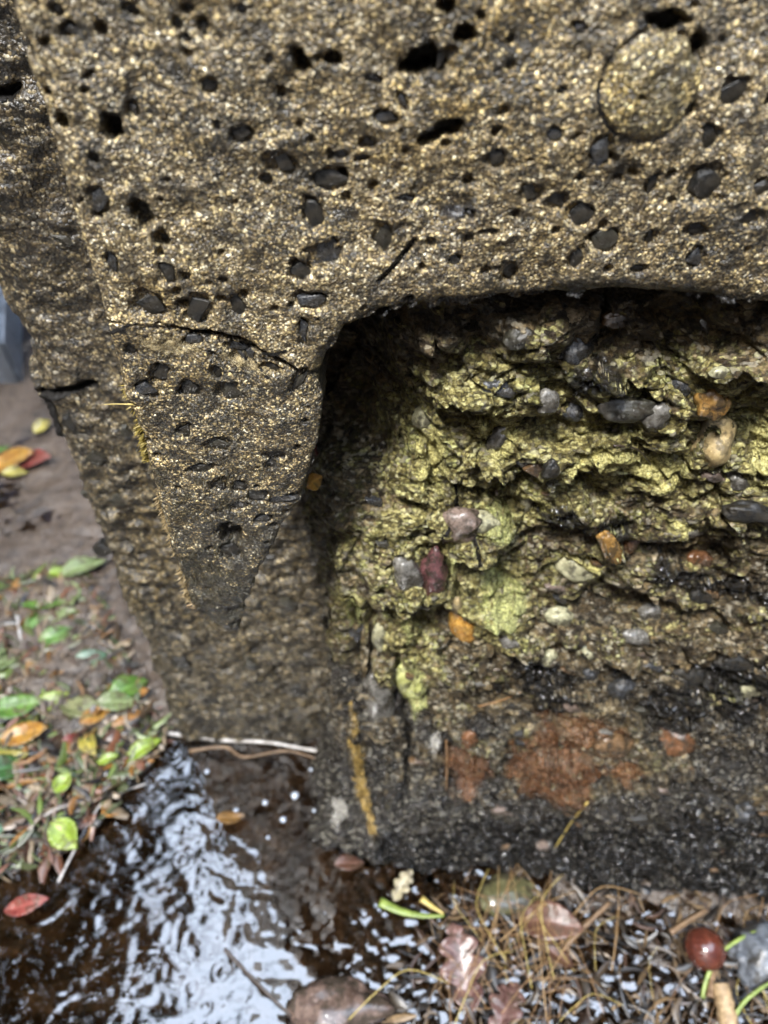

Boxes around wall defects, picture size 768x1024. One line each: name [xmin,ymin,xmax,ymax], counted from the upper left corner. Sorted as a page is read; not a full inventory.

crack [378,238,417,284]
crack [110,324,130,335]
crack [237,349,287,379]
spalling [301,287,768,898]
corrosion [508,708,643,808]